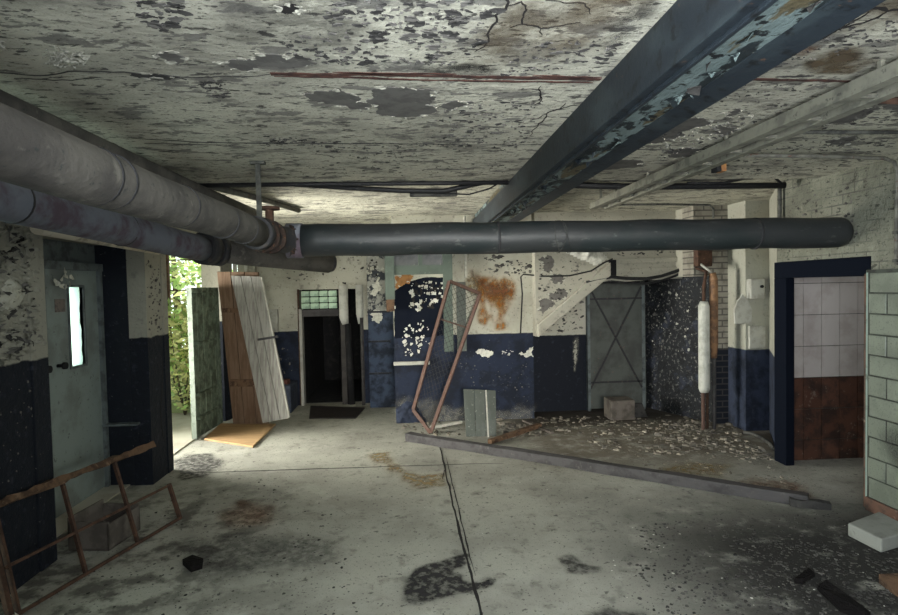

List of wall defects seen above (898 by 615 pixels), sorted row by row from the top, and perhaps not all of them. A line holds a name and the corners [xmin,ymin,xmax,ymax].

crack [475,0,590,52]
crack [819,7,898,41]
crack [0,71,602,145]
peeling [666,61,722,108]
damp [805,48,864,74]
peeling [0,223,47,367]
peeling [333,256,381,296]
peeling [394,275,444,356]
rust [465,276,515,329]
crack [196,447,496,615]